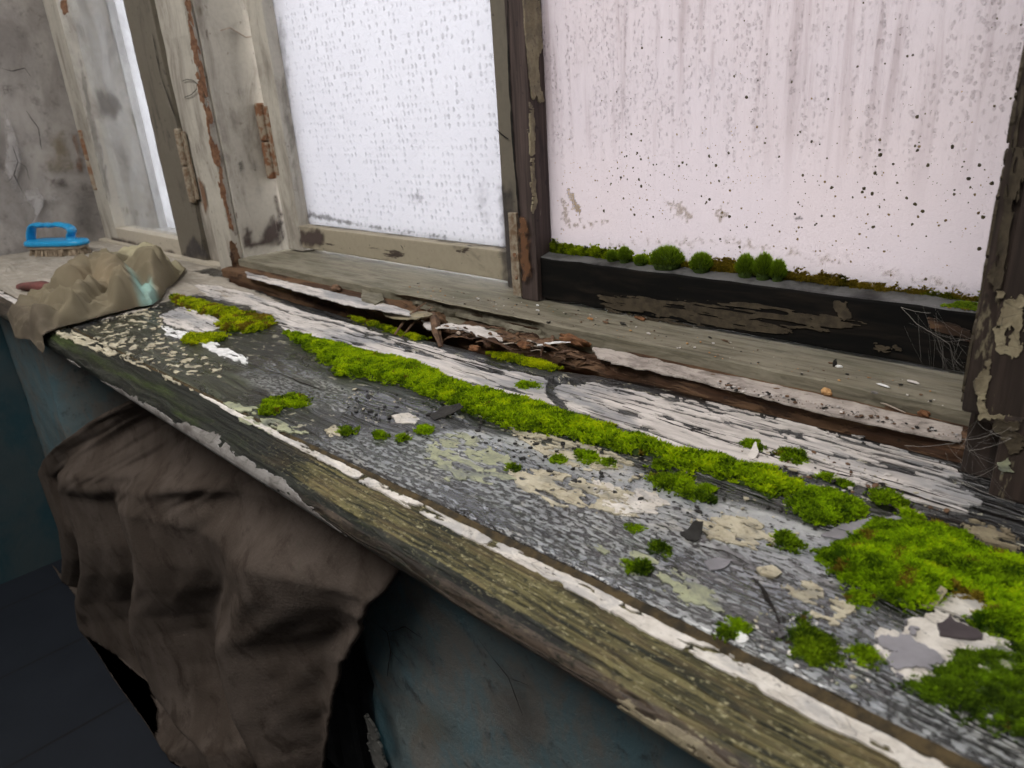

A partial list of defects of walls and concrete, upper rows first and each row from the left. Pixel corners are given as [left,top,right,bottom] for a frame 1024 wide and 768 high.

crack [7,112,42,192]
leakage [555,117,839,255]
leakage [808,135,925,271]
leakage [926,161,994,234]
peeling [245,271,503,342]
peeling [194,284,1021,551]
peeling [46,307,948,768]
peeling [874,586,1016,682]